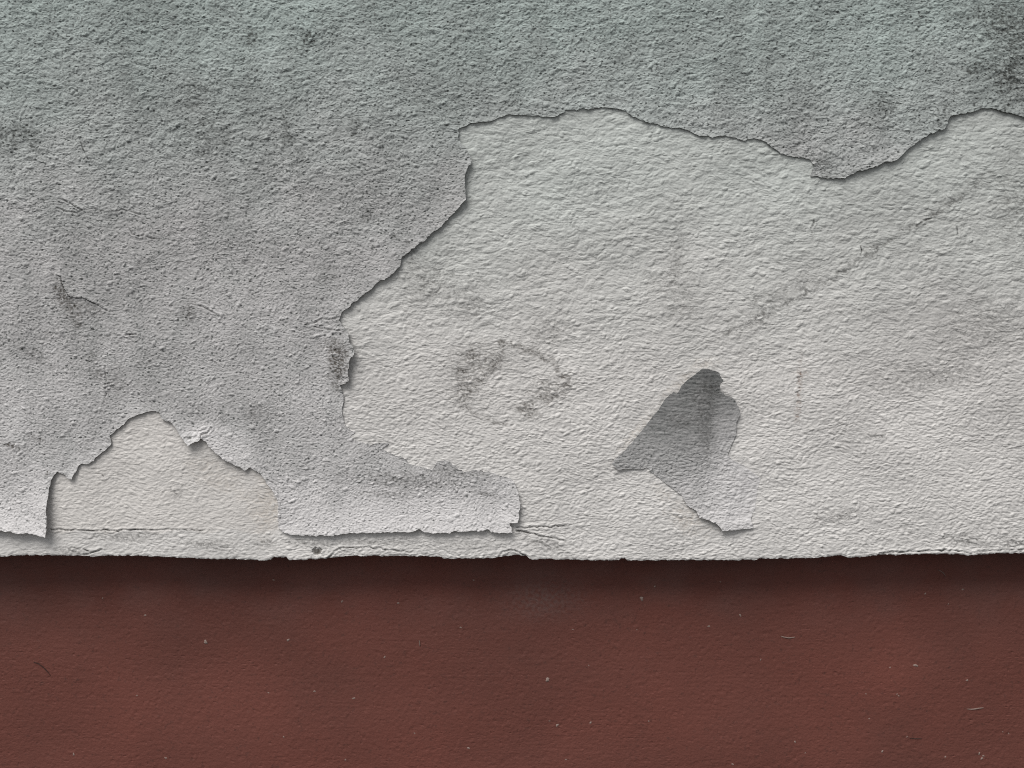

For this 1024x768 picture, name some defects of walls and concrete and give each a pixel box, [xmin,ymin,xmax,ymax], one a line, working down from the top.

peeling [0,102,1024,561]